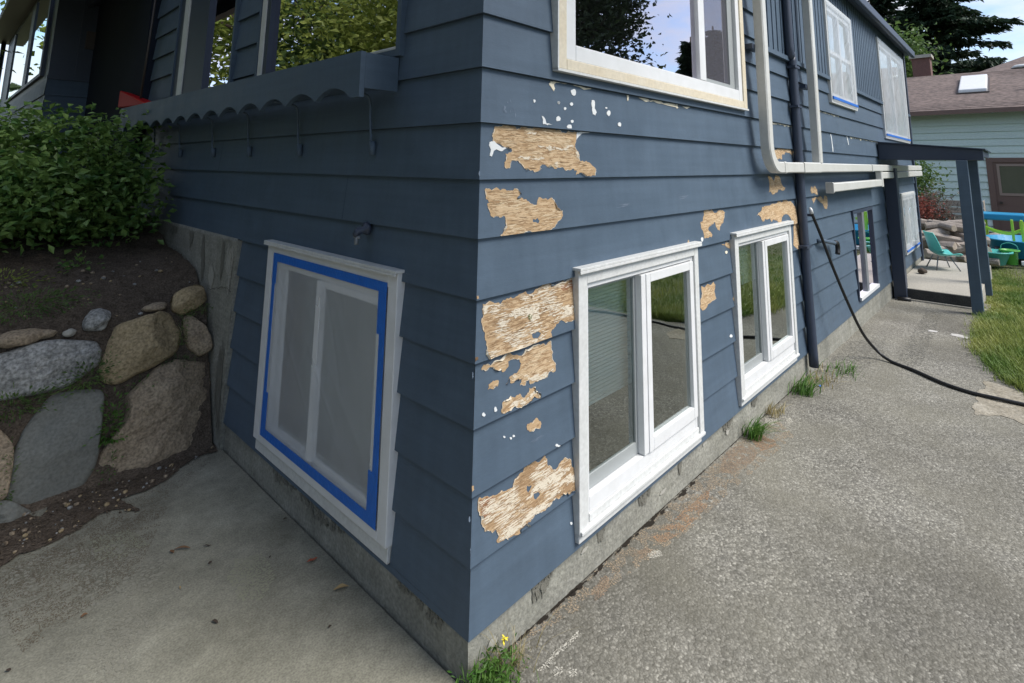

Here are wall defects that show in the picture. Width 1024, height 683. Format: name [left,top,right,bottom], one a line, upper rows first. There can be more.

peeling [489,116,596,176]
peeling [485,187,563,236]
peeling [687,209,725,243]
peeling [758,175,800,249]
peeling [810,186,828,209]
peeling [700,282,716,311]
peeling [472,278,575,416]
peeling [468,444,576,543]